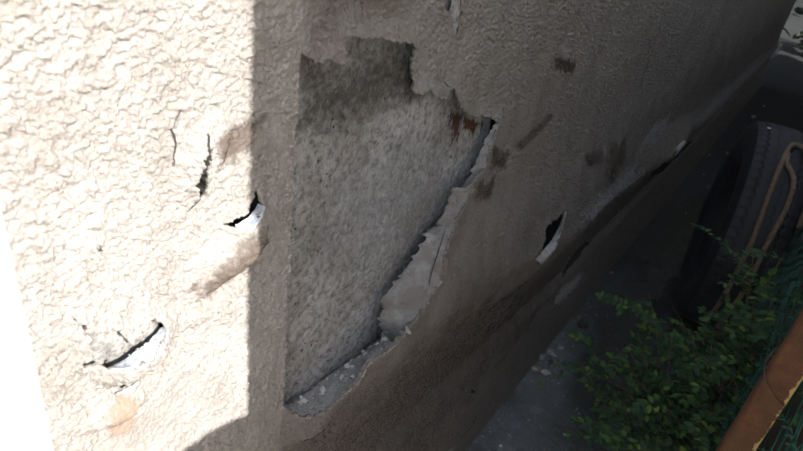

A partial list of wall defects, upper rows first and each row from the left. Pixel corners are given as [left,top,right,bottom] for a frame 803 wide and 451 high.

peeling [445,0,461,34]
crack [171,110,181,166]
rust [448,111,483,144]
crack [187,133,212,212]
peeling [235,203,266,232]
peeling [282,37,500,419]
peeling [535,212,567,265]
peeling [73,318,170,373]